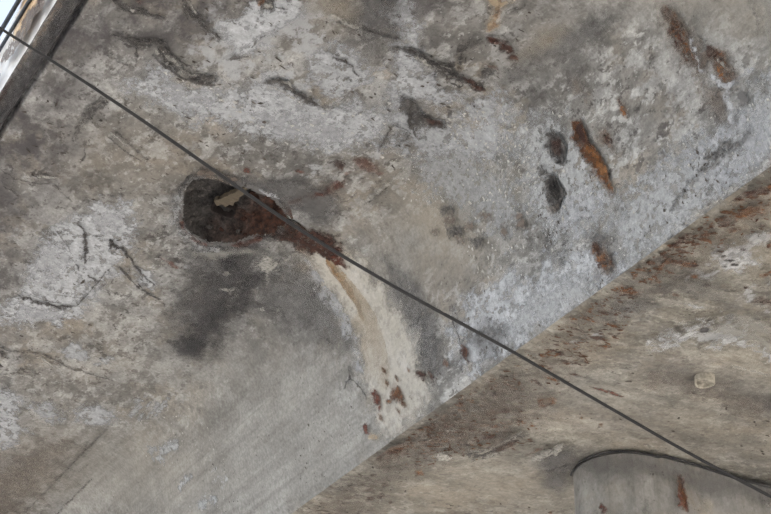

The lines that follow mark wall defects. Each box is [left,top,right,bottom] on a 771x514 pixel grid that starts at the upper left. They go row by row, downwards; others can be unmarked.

rust [658,6,738,115]
spalling [178,174,294,243]
spalling [396,96,447,146]
damp [119,0,771,380]
spalling [537,165,564,214]
spalling [544,132,566,165]
rust [570,120,616,196]
crack [19,224,155,310]
rust [519,171,771,369]
crack [0,347,113,382]
damp [279,224,439,438]
rust [309,368,551,514]